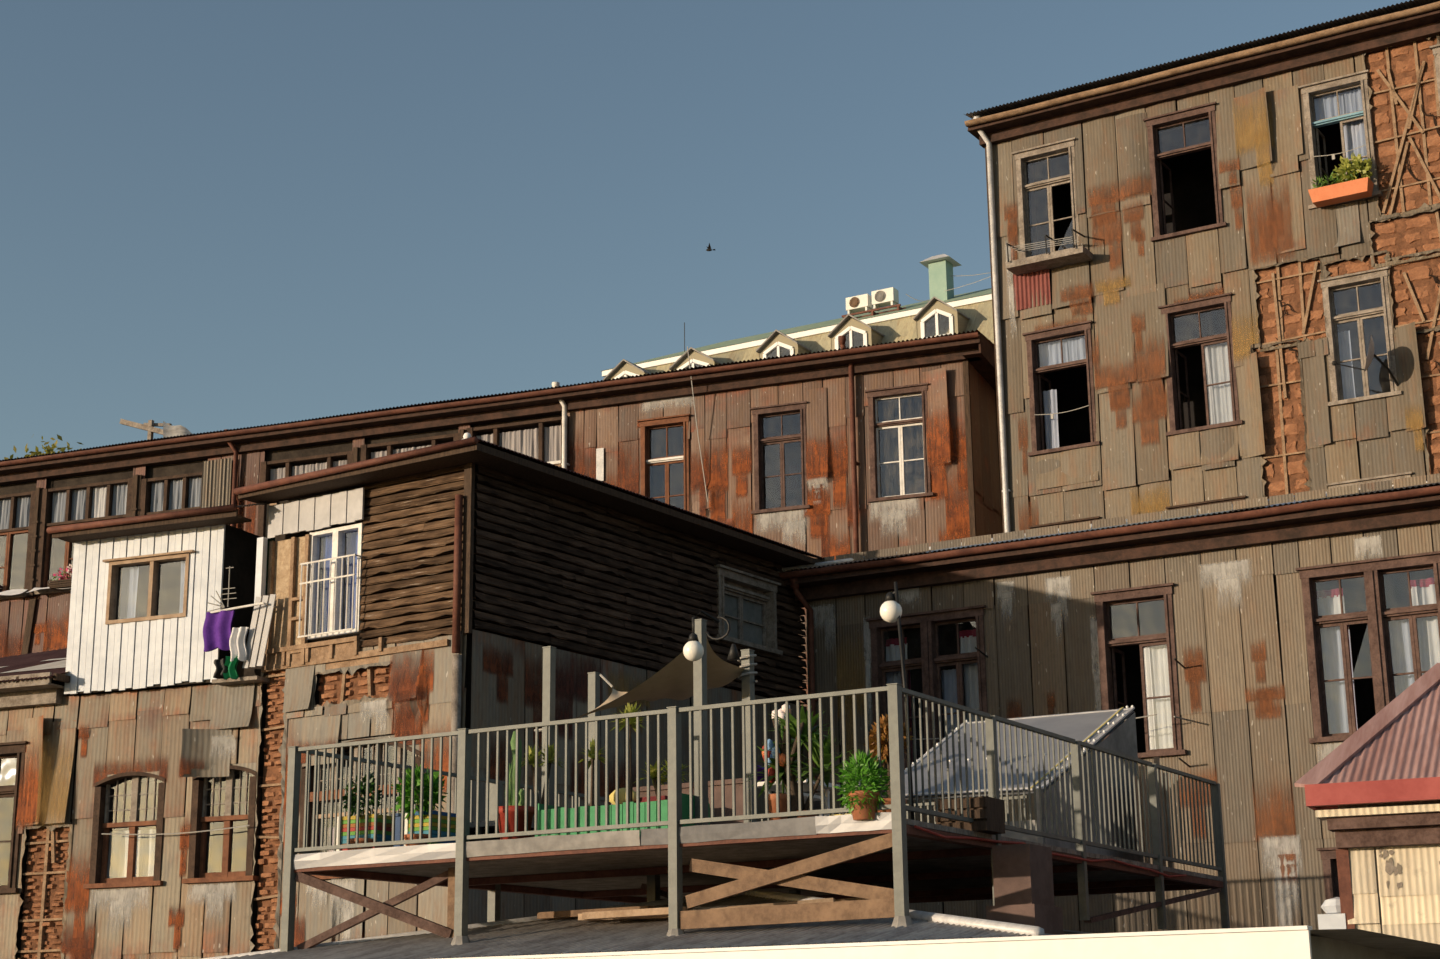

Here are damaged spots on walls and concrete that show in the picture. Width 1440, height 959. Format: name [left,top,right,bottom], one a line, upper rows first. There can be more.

corrosion [1219,111,1293,262]
corrosion [1035,177,1151,331]
corrosion [1092,316,1167,444]
corrosion [926,415,970,542]
damp [1201,559,1249,600]
corrosion [0,619,69,658]
corrosion [388,653,449,792]
corrosion [490,745,506,781]
corrosion [483,649,649,747]
corrosion [571,758,636,805]
corrosion [1245,644,1285,718]
damp [1263,836,1301,927]